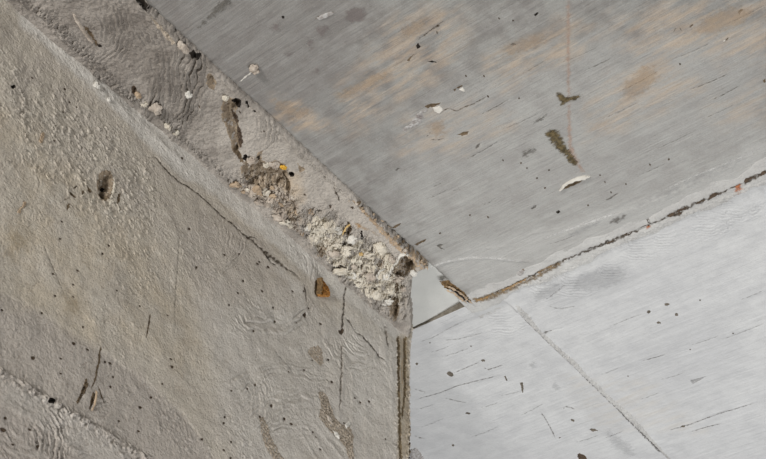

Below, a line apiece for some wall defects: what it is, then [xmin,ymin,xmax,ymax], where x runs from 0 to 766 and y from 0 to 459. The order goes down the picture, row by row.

water stain [545,130,577,165]
water stain [557,93,579,106]
crack [156,158,294,273]
spalling [221,95,428,321]
crack [498,171,766,291]